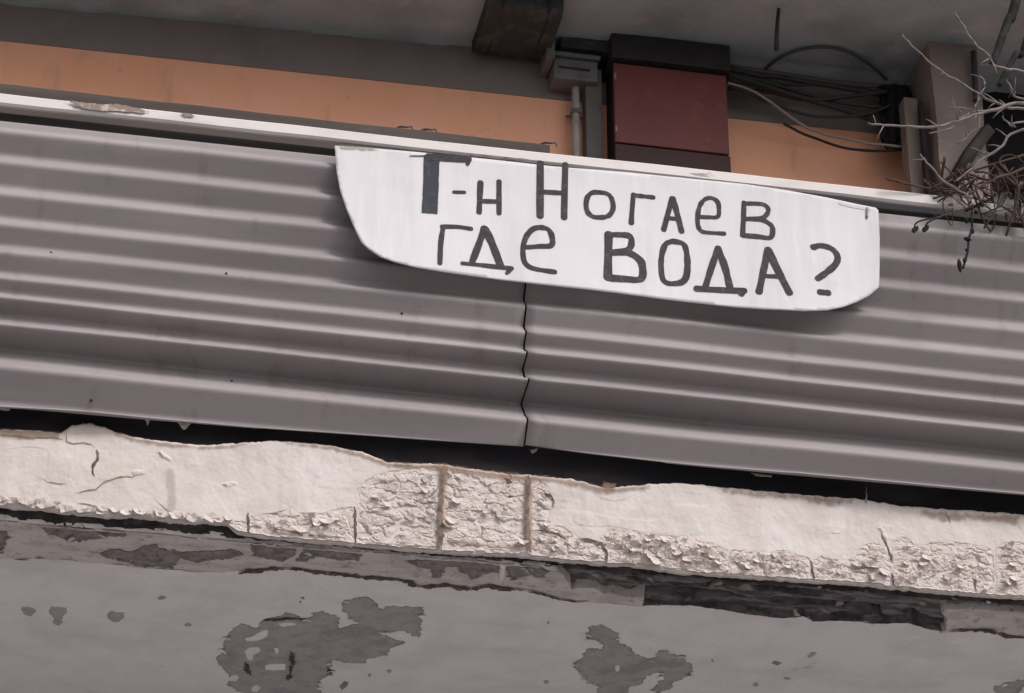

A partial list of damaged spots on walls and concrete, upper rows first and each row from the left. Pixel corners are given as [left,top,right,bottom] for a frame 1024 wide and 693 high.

peeling [68,100,149,113]
crack [3,434,171,513]
spalling [0,466,1024,631]
crack [881,533,895,585]
peeling [216,596,426,693]
peeling [572,624,694,693]